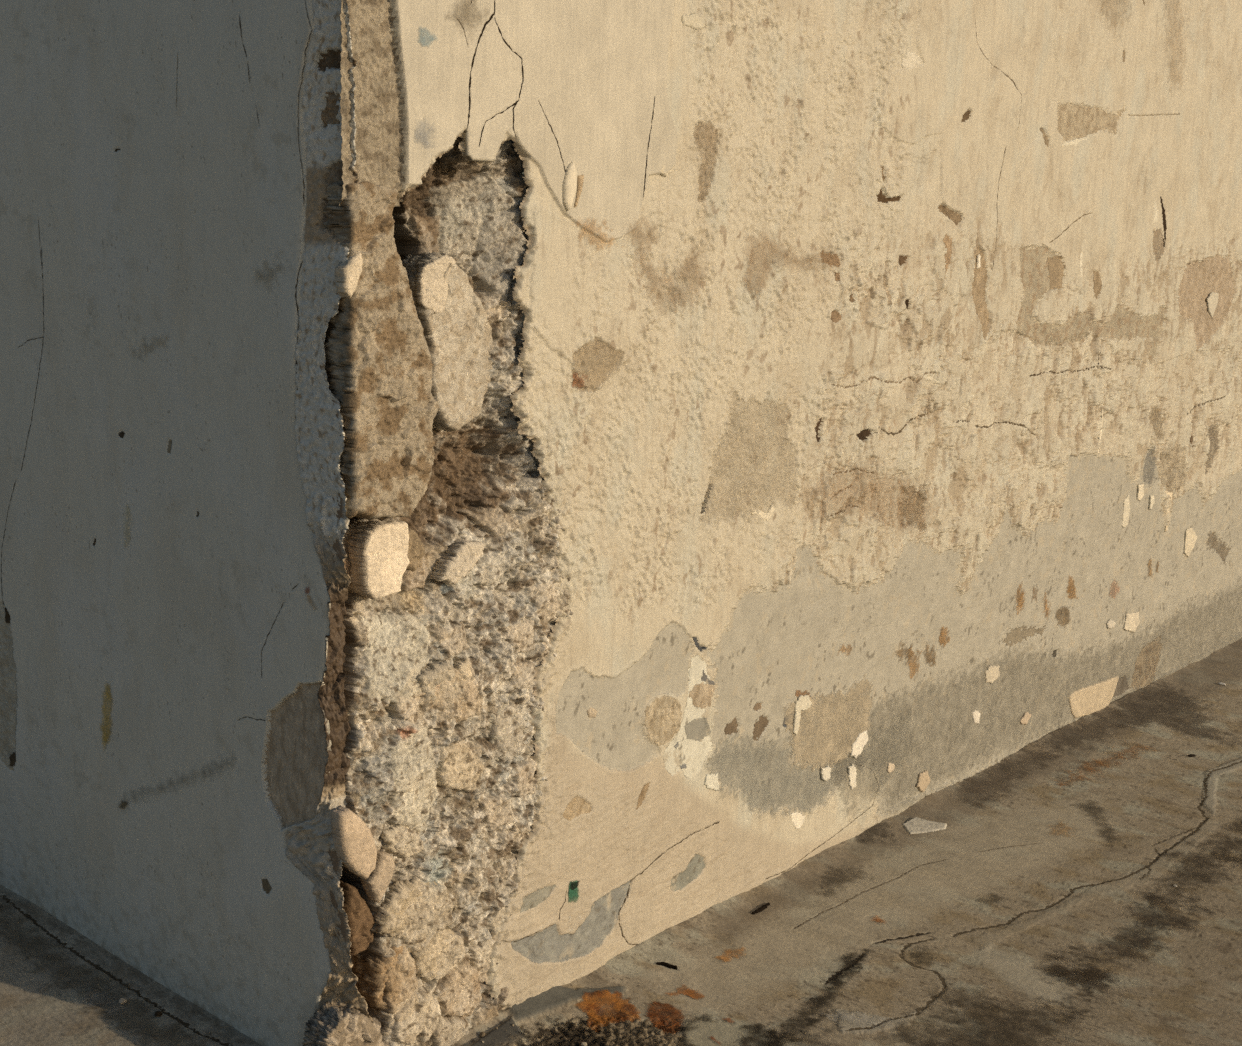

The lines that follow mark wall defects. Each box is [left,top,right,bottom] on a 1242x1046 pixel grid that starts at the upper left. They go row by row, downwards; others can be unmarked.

crack [458,1,566,172]
crack [643,100,655,198]
spalling [264,0,1242,1046]
peeling [0,601,17,771]
crack [766,764,879,879]
crack [795,859,946,928]
crack [825,761,1242,1031]
leakage [885,822,1242,1046]
leakage [517,1019,610,1046]
corrosion [578,986,704,1033]
leakage [673,1014,710,1046]
leakage [741,948,873,1046]